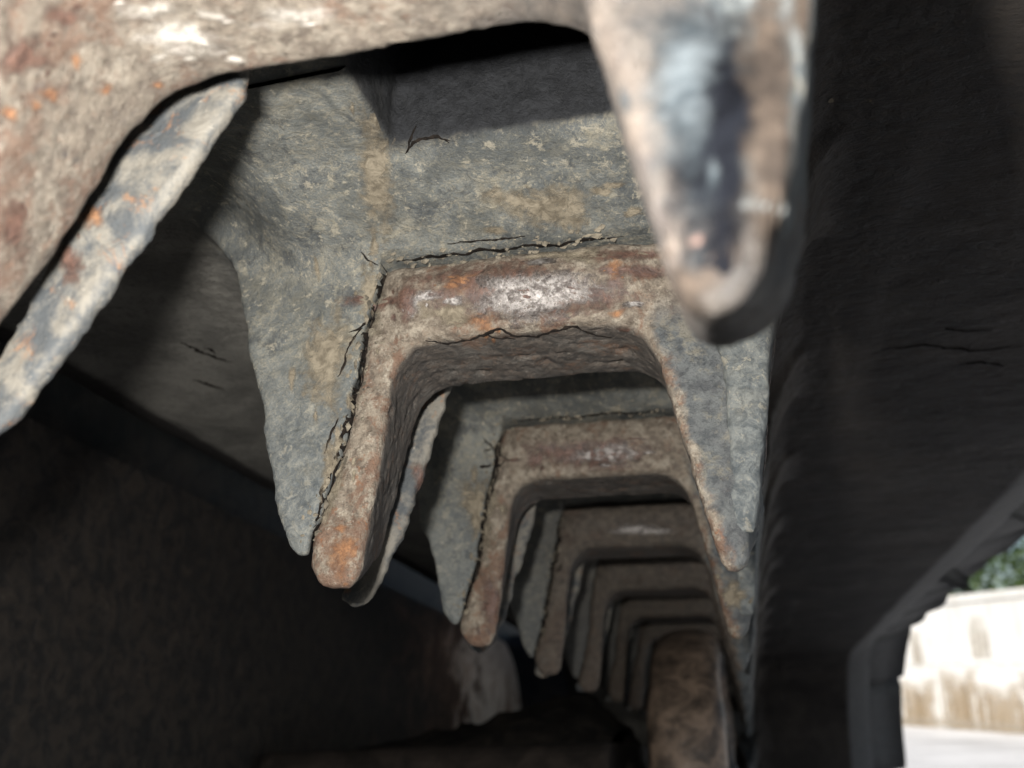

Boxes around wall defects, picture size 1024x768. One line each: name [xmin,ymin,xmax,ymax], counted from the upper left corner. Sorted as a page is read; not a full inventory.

corrosion [0,2,79,77]
crack [405,126,450,154]
corrosion [4,203,28,245]
corrosion [59,234,82,282]
corrosion [346,261,551,342]
corrosion [542,250,665,332]
crack [300,224,635,543]
corrosion [522,438,648,471]
crack [453,405,664,616]